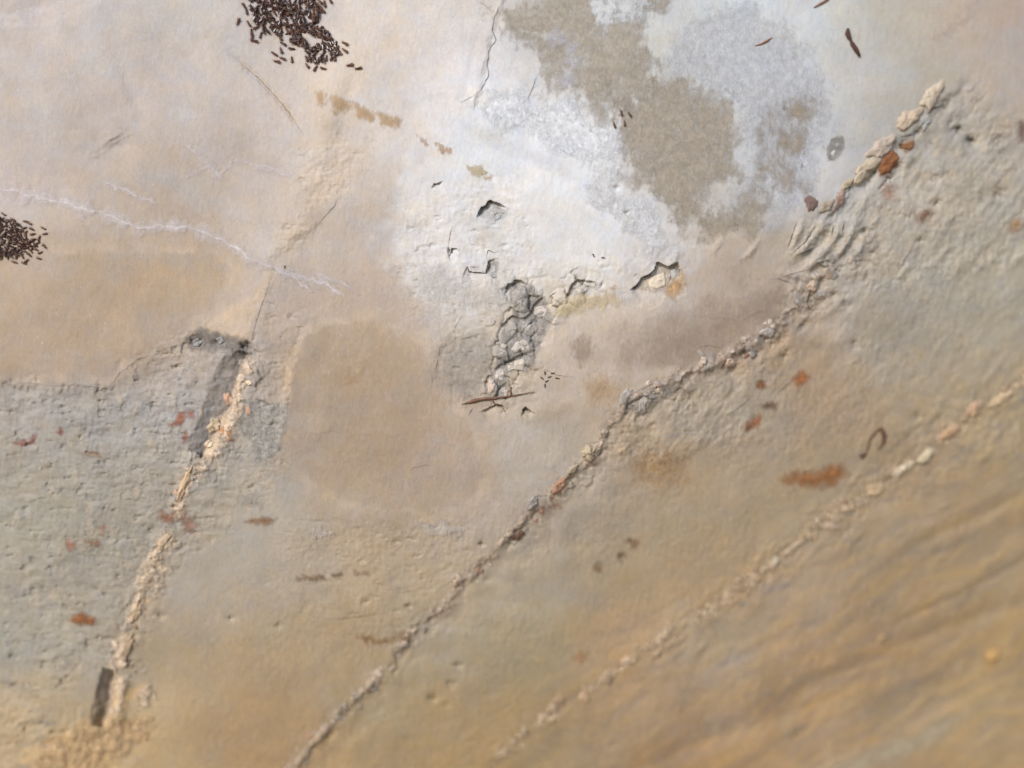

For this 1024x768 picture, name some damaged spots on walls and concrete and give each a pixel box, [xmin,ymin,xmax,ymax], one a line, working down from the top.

crack [464,0,504,107]
damp [485,0,827,256]
crack [892,103,974,149]
spalling [191,329,252,407]
crack [432,232,596,416]
spalling [641,267,680,290]
crack [615,222,845,423]
corrosion [788,466,842,486]